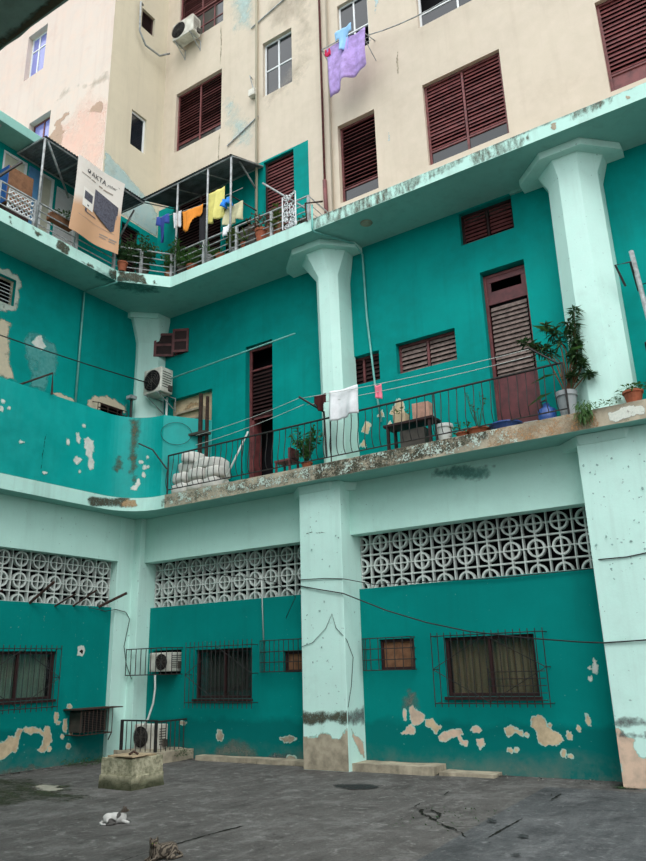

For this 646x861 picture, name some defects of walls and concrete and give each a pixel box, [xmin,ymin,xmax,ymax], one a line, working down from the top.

damp [313,189,390,228]
flaking render [0,268,22,379]
damp [115,420,139,481]
damp [282,431,487,482]
peeling [0,704,73,760]
flaking render [279,728,365,772]
damp [303,708,365,725]
peeling [401,704,486,750]
peeling [504,713,592,759]
damp [615,718,645,737]
flaking render [616,728,646,789]
crack [176,826,241,844]